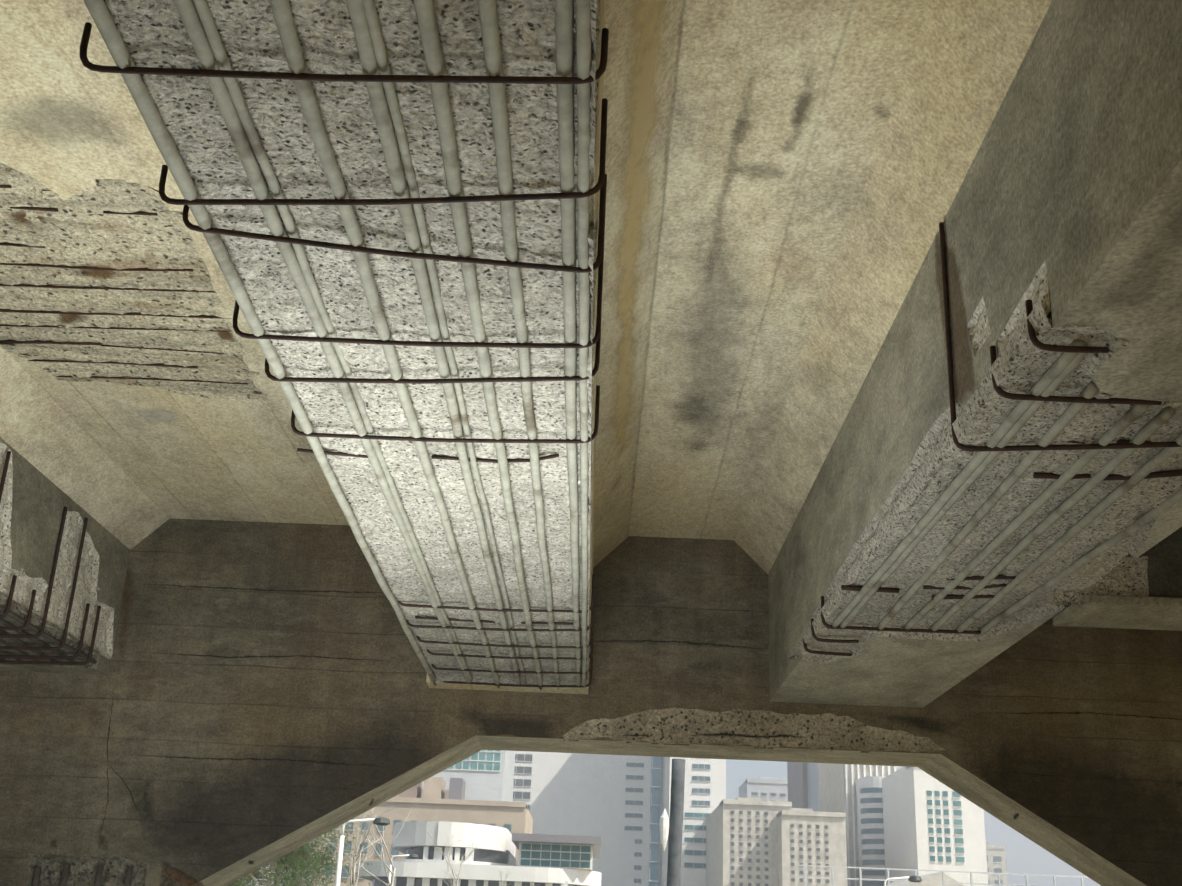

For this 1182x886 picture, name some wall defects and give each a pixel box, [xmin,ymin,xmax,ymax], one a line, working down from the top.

spalling [0,0,609,690]
water stain [615,0,662,447]
spalling [787,222,1182,665]
spalling [27,853,205,886]
spalling [562,708,945,752]